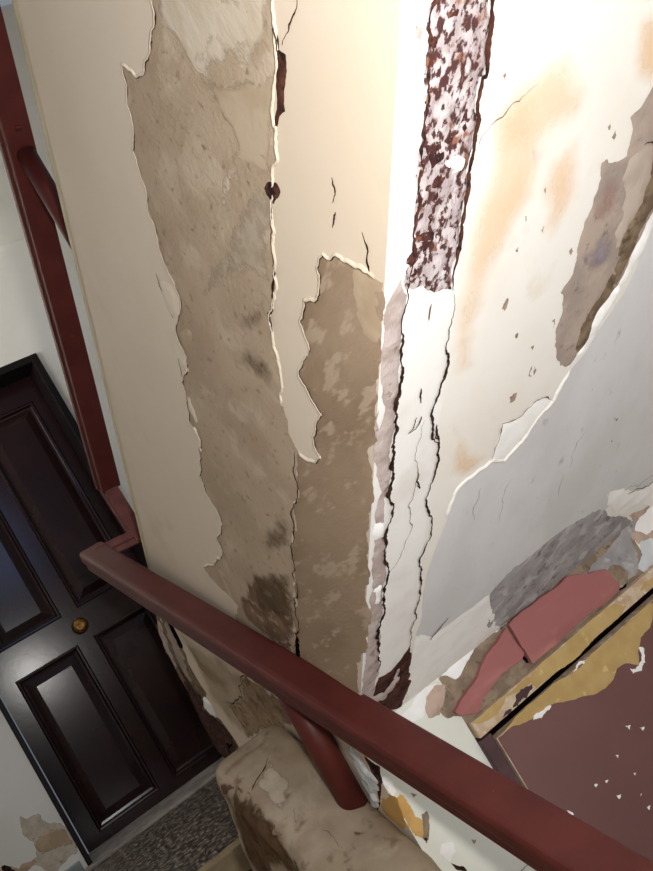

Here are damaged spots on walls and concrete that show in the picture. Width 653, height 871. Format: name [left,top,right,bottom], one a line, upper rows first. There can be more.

rust [404,0,495,293]
crack [267,208,276,331]
peeling [120,0,408,698]
peeling [402,87,653,733]
crack [375,281,455,674]
crack [290,453,300,657]
peeling [224,675,291,738]
peeling [0,814,77,871]
peeling [252,758,288,808]
peeling [349,746,430,843]
peeling [440,842,467,871]